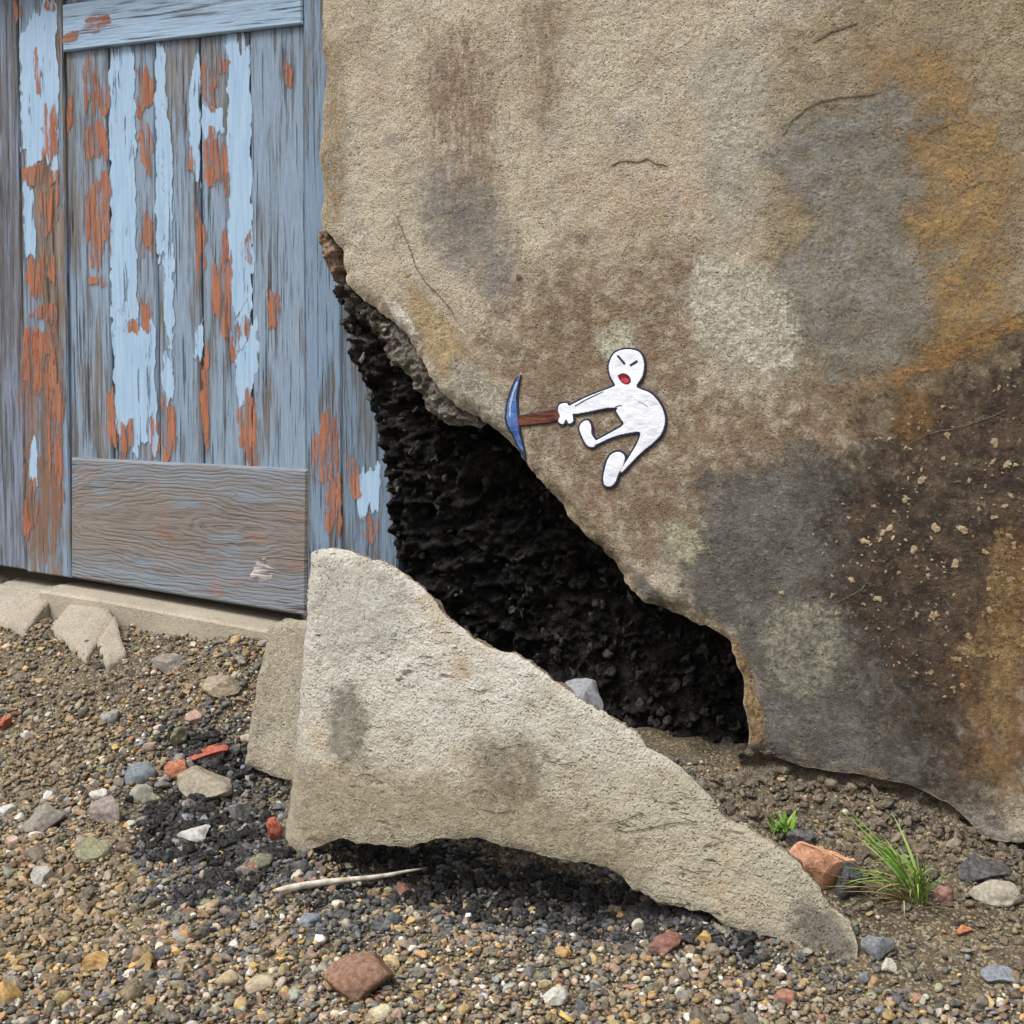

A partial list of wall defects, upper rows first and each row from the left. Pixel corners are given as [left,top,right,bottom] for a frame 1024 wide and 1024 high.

peeling [283,60,293,88]
crack [611,158,668,167]
crack [782,93,877,135]
peeling [13,0,178,564]
peeling [186,32,280,466]
crack [393,215,457,323]
water stain [499,36,1024,828]
flaking render [875,411,954,456]
flaking render [974,438,1024,519]
spalling [311,229,857,940]
flaking render [812,458,1024,698]